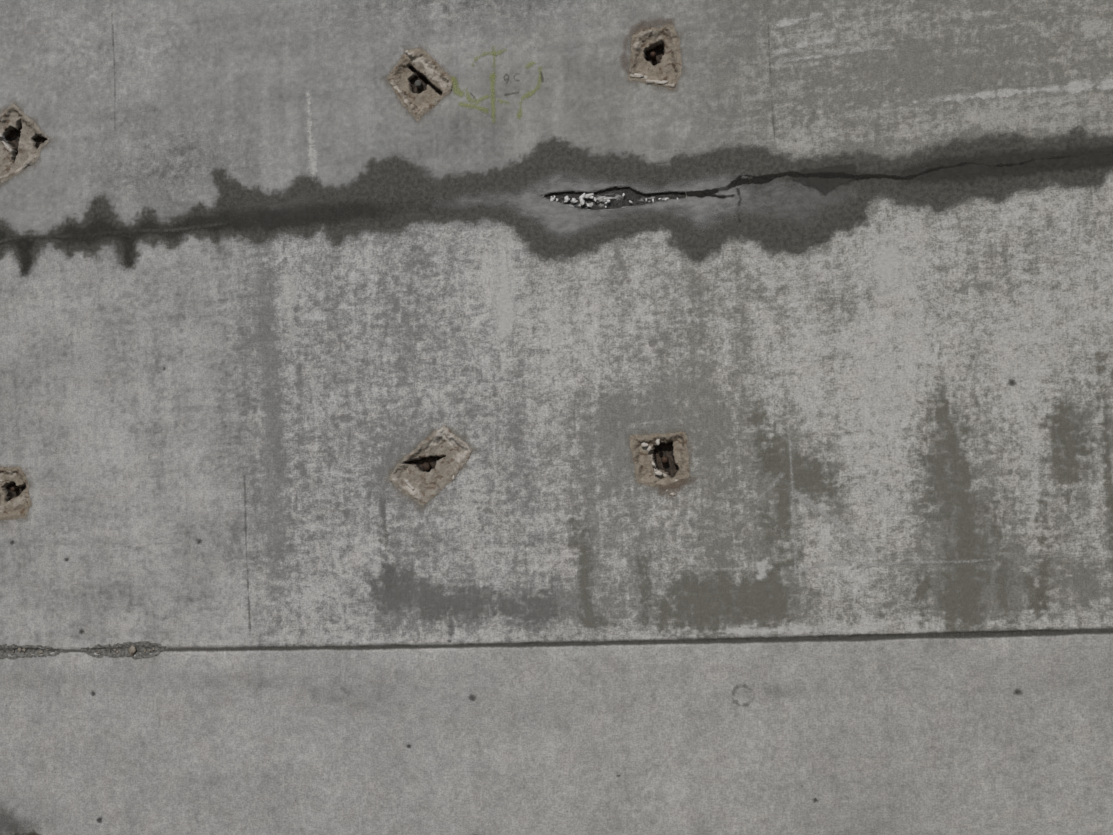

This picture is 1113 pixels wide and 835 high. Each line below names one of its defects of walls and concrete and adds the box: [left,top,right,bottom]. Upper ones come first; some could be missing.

leakage [776,13,822,27]
leakage [774,38,856,61]
leakage [938,79,1113,101]
leakage [0,93,1113,341]
crack [542,163,962,222]
peeling [641,439,678,496]
leakage [658,558,883,636]